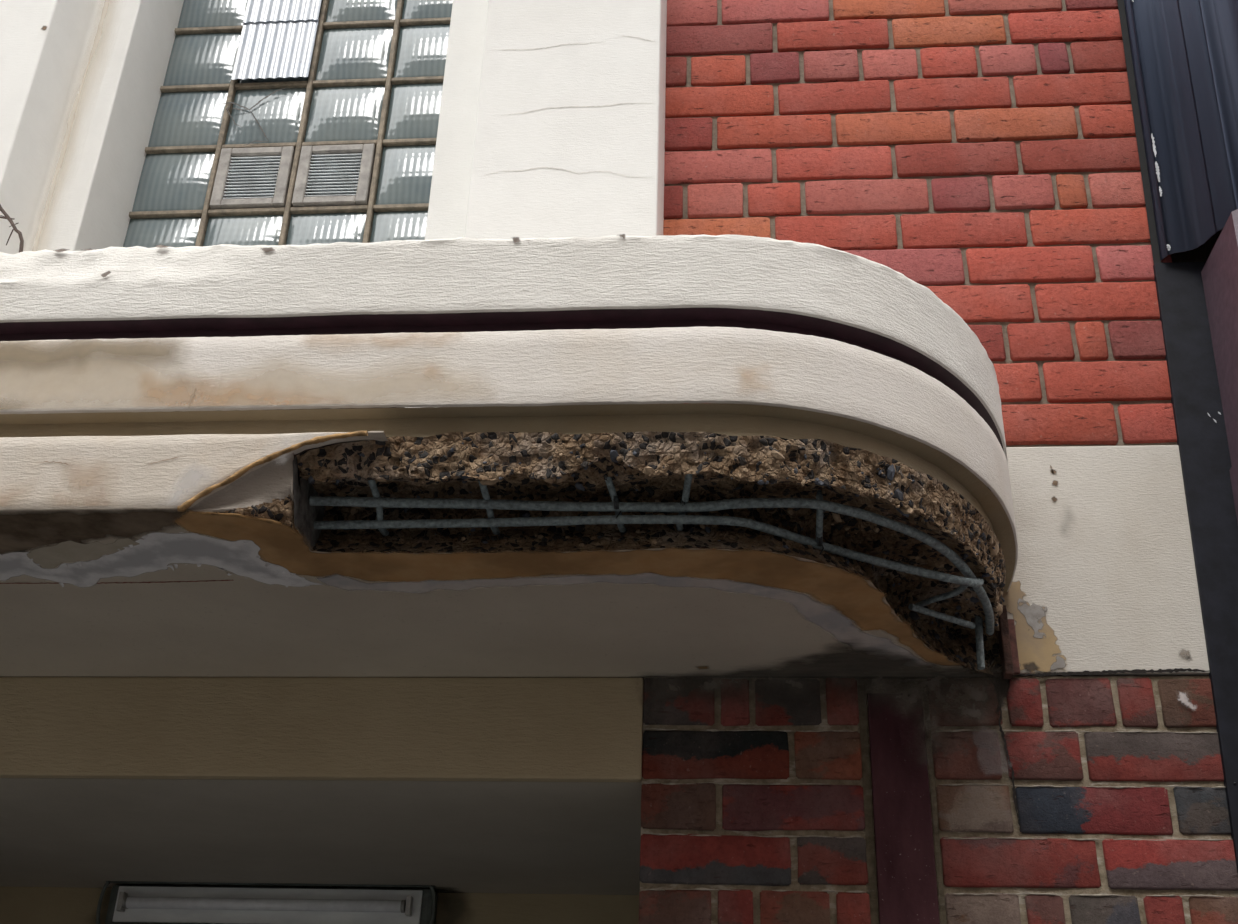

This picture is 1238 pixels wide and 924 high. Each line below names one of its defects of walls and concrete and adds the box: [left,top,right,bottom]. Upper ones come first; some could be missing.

crack [496,36,651,50]
crack [501,103,652,116]
crack [486,167,647,178]
spalling [0,430,1066,676]